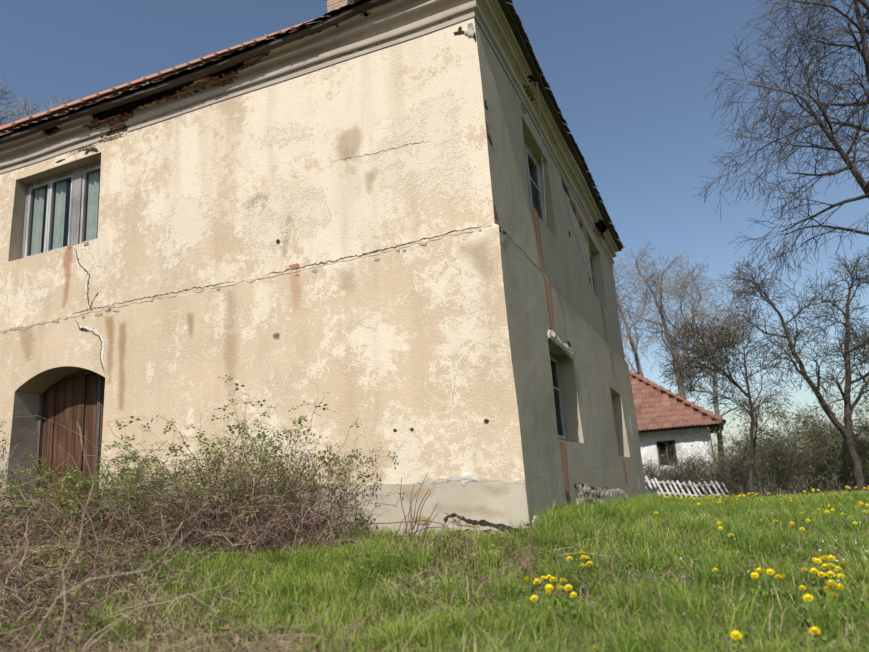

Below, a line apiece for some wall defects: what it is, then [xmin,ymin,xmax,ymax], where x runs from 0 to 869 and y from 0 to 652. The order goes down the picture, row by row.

crack [262,224,486,276]
crack [72,246,232,372]
corrosion [107,318,124,382]